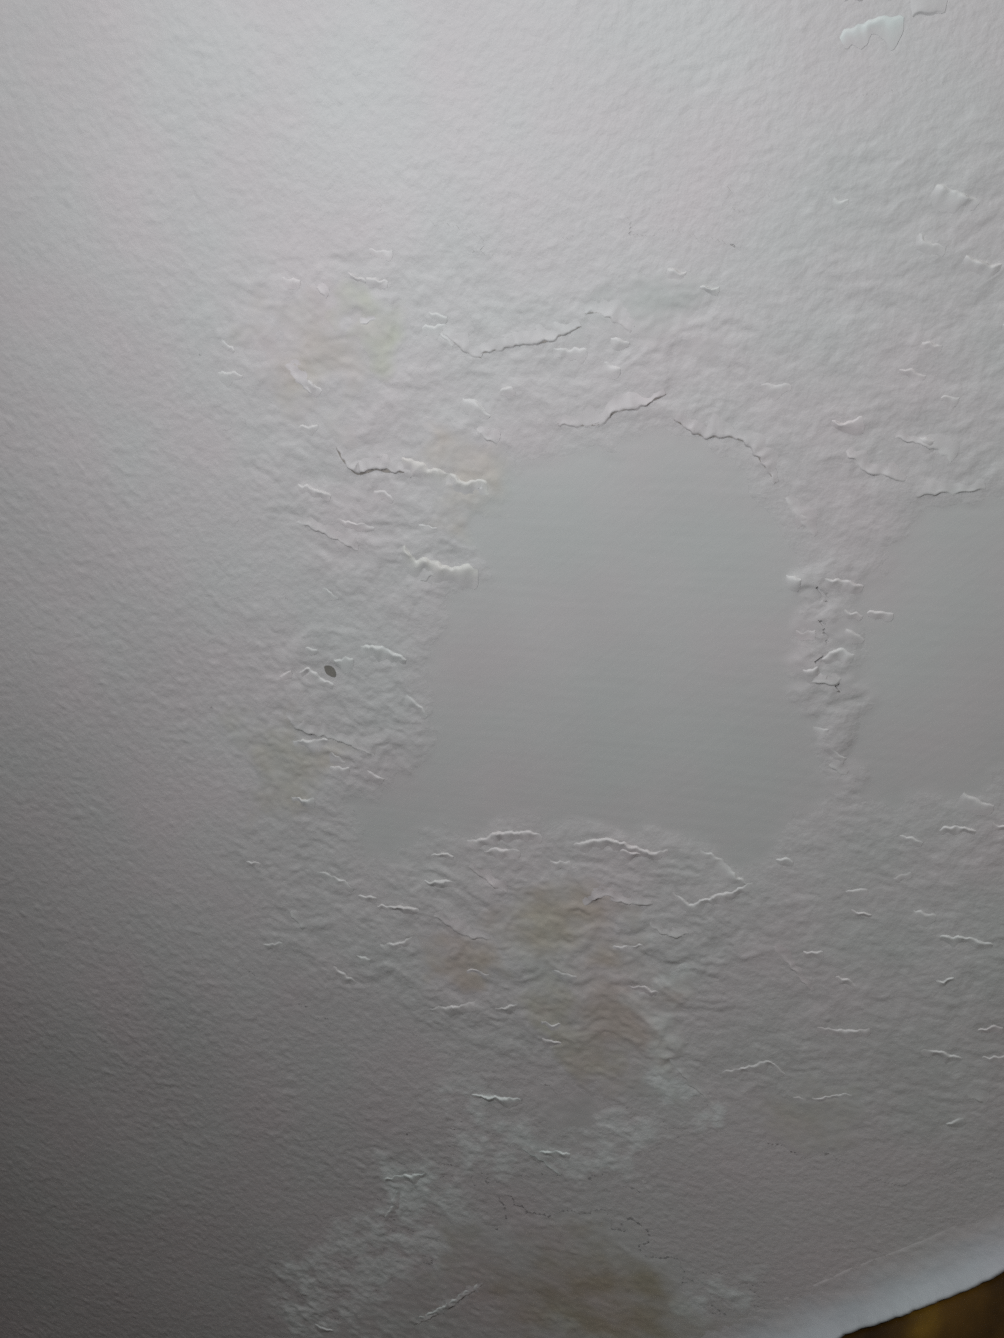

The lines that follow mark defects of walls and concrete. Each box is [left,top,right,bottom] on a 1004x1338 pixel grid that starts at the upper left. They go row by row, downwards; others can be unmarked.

peeling [347,427,894,869]
leakage [258,873,773,1338]